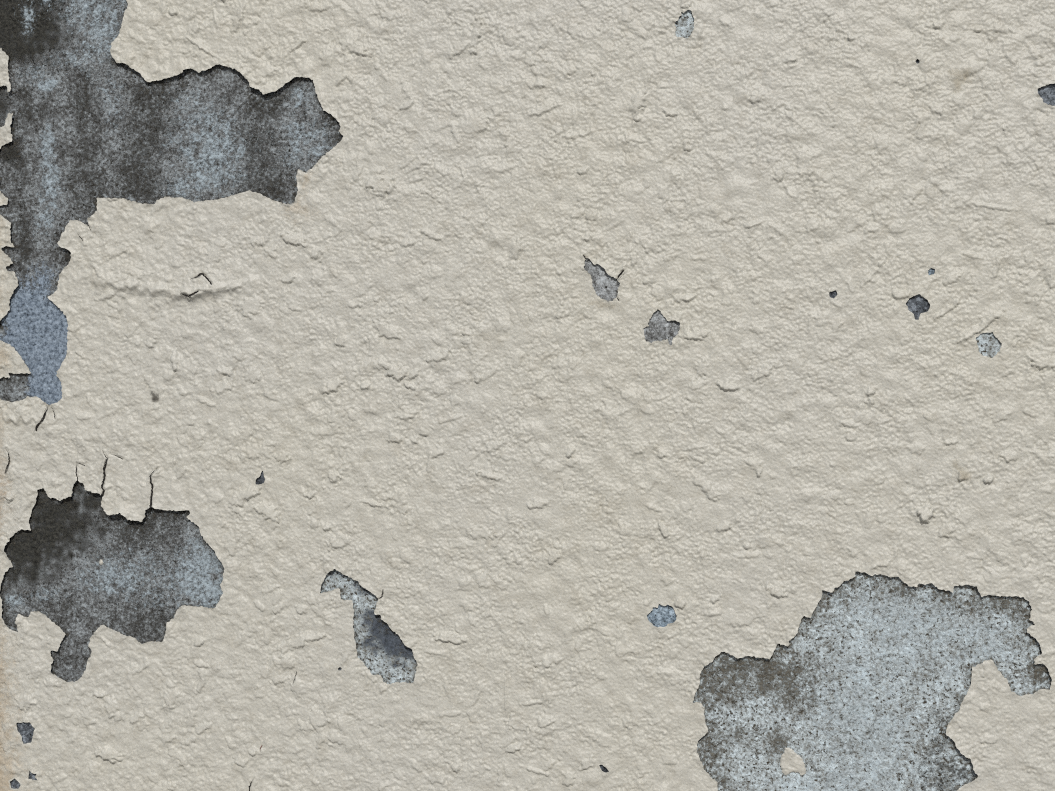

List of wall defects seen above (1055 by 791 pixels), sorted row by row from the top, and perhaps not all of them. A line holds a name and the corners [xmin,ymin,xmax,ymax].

peeling [1034,80,1055,109]
peeling [0,0,347,407]
peeling [580,254,623,304]
peeling [640,306,684,348]
peeling [902,291,933,323]
peeling [972,329,1005,362]
crack [75,452,122,496]
crack [148,468,158,509]
peeling [0,477,227,684]
peeling [317,566,421,687]
peeling [644,599,681,630]
peeling [689,568,1055,791]